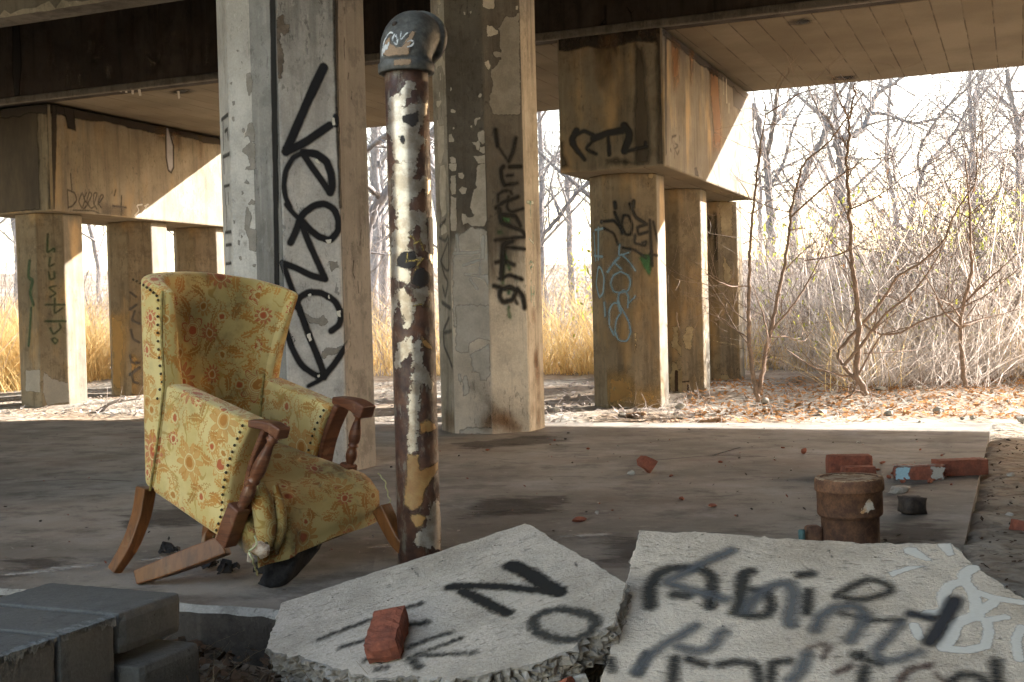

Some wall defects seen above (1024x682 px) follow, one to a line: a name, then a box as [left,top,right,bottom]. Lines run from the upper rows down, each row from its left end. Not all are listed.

peeling [463,0,495,15]
rust [710,71,721,148]
peeling [232,101,257,267]
peeling [387,56,491,454]
peeling [411,496,441,551]